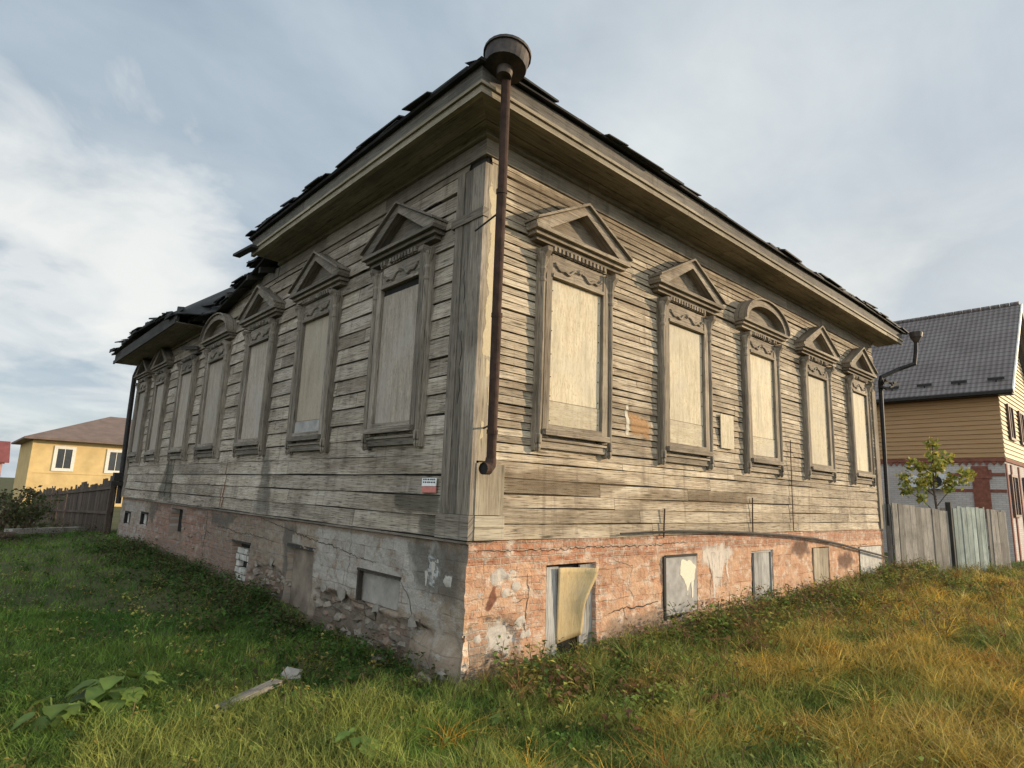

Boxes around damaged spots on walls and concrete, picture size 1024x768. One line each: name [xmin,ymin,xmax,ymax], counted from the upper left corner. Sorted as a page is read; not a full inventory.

crack [202,511,374,584]
flaking render [307,582,427,667]
peeling [425,555,453,588]
flaking render [463,567,531,687]
crack [474,542,688,641]